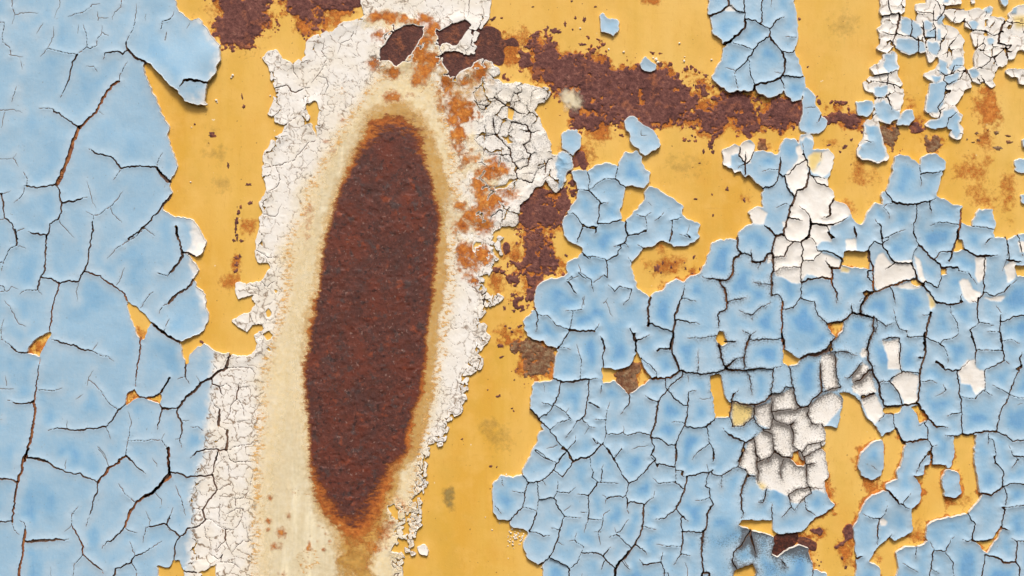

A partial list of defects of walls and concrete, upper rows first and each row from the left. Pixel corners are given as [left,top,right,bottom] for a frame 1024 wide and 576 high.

crack [0,0,488,576]
peeling [0,0,582,576]
crack [415,73,555,515]
rust [204,0,802,576]
peeling [492,0,1024,576]
crack [495,143,1024,576]
rust [772,465,837,567]
rust [816,95,865,153]